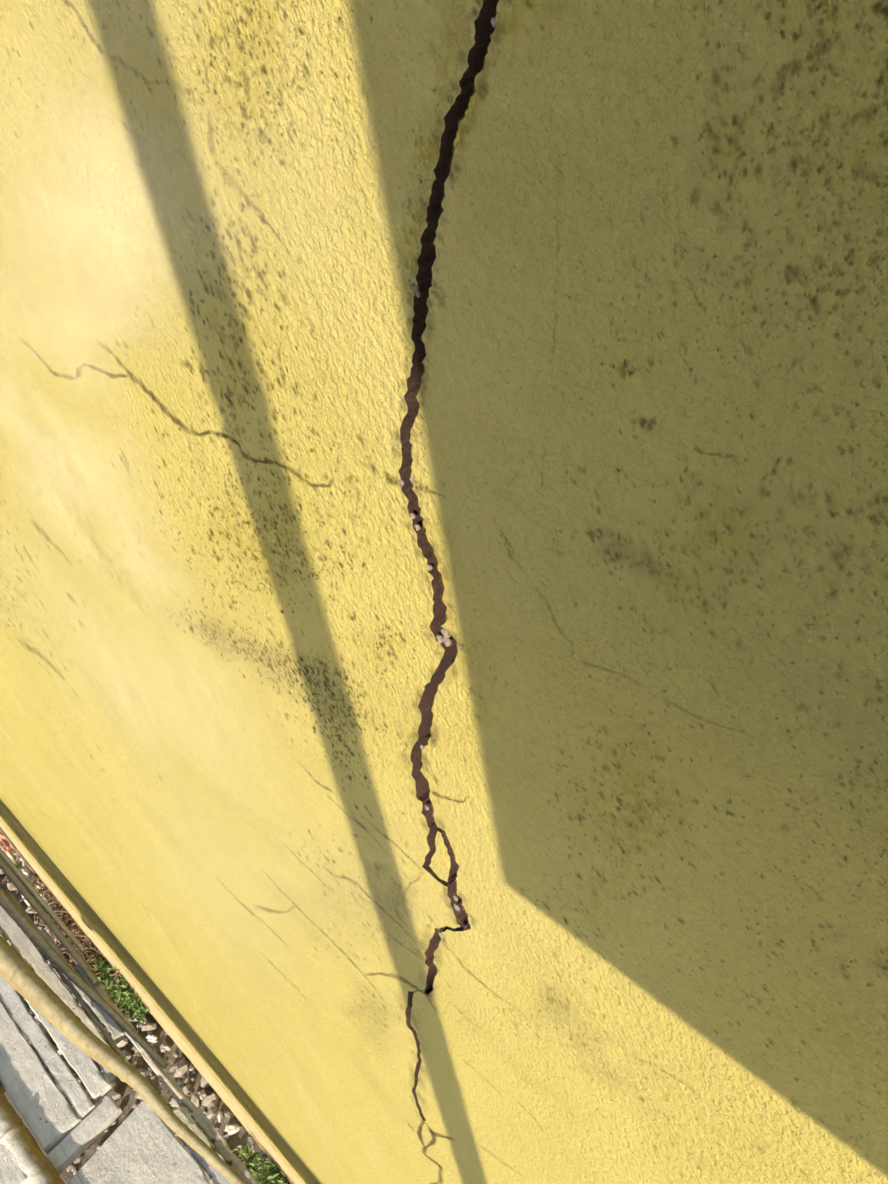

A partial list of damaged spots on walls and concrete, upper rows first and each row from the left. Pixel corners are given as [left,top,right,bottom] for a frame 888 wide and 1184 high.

crack [38,349,330,487]
crack [369,0,499,1184]